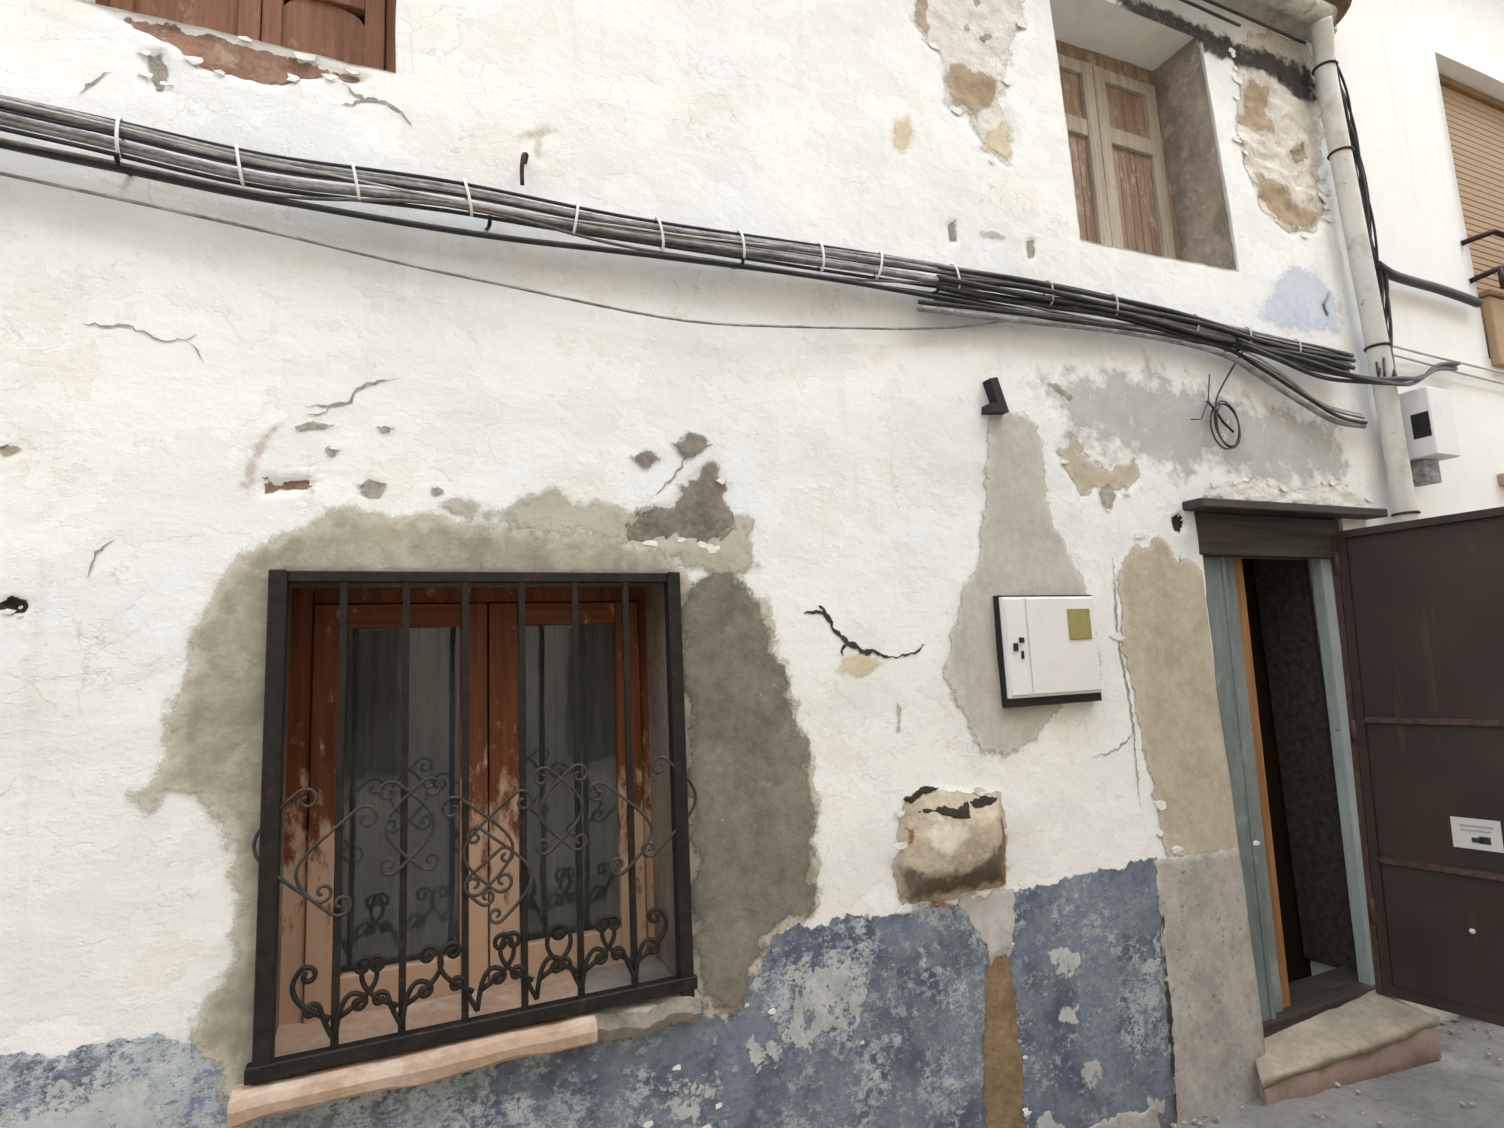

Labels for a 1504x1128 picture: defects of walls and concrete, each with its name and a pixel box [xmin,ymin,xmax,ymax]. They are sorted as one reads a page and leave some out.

spalling [124,17,360,86]
peeling [909,0,1027,165]
spalling [1229,29,1333,239]
spalling [1049,383,1073,401]
spalling [263,477,315,494]
spalling [358,479,386,498]
spalling [625,432,735,553]
peeling [1056,435,1140,511]
crack [804,605,924,659]
peeling [1081,1059,1103,1090]
peeling [1146,1097,1166,1114]